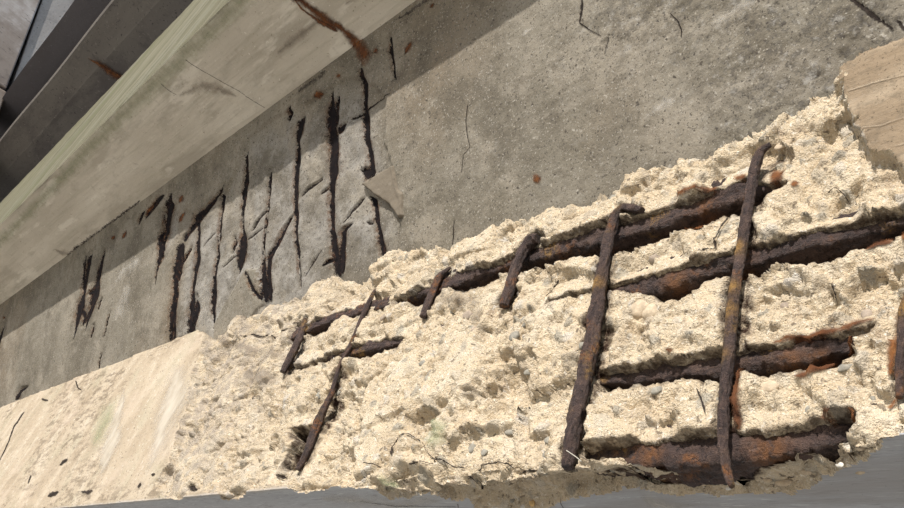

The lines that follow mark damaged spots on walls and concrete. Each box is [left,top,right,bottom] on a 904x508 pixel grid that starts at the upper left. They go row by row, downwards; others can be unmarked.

corrosion [293,0,378,61]
crack [579,0,609,54]
crack [851,0,904,30]
crack [138,37,397,340]
corrosion [677,184,718,197]
crack [72,254,110,368]
spalling [154,63,904,508]
corrosion [773,318,873,357]
corrosion [887,318,898,374]
crack [0,386,48,459]
corrosion [729,368,743,429]
crack [363,433,537,489]